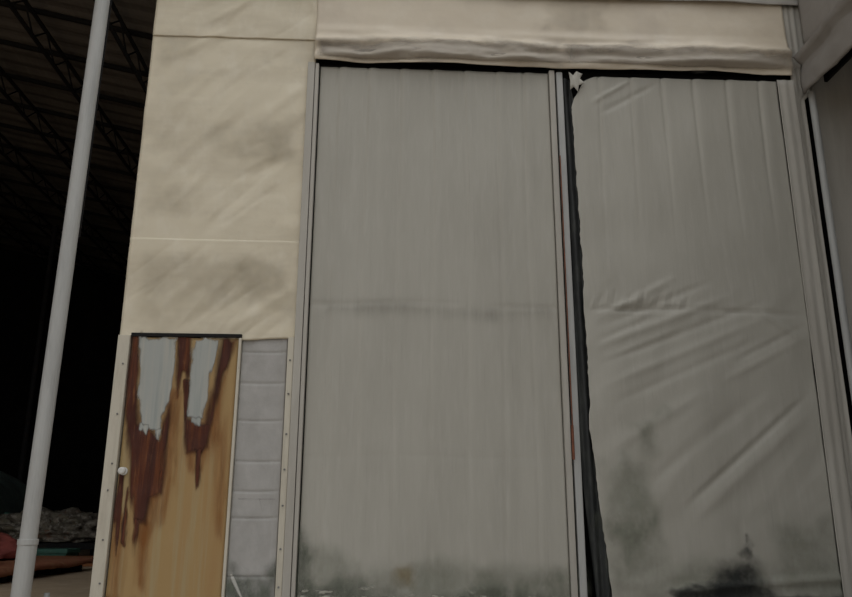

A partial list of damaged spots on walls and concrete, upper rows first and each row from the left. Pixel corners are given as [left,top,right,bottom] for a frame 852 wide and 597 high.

rust [114,336,235,565]
water stain [674,565,771,597]